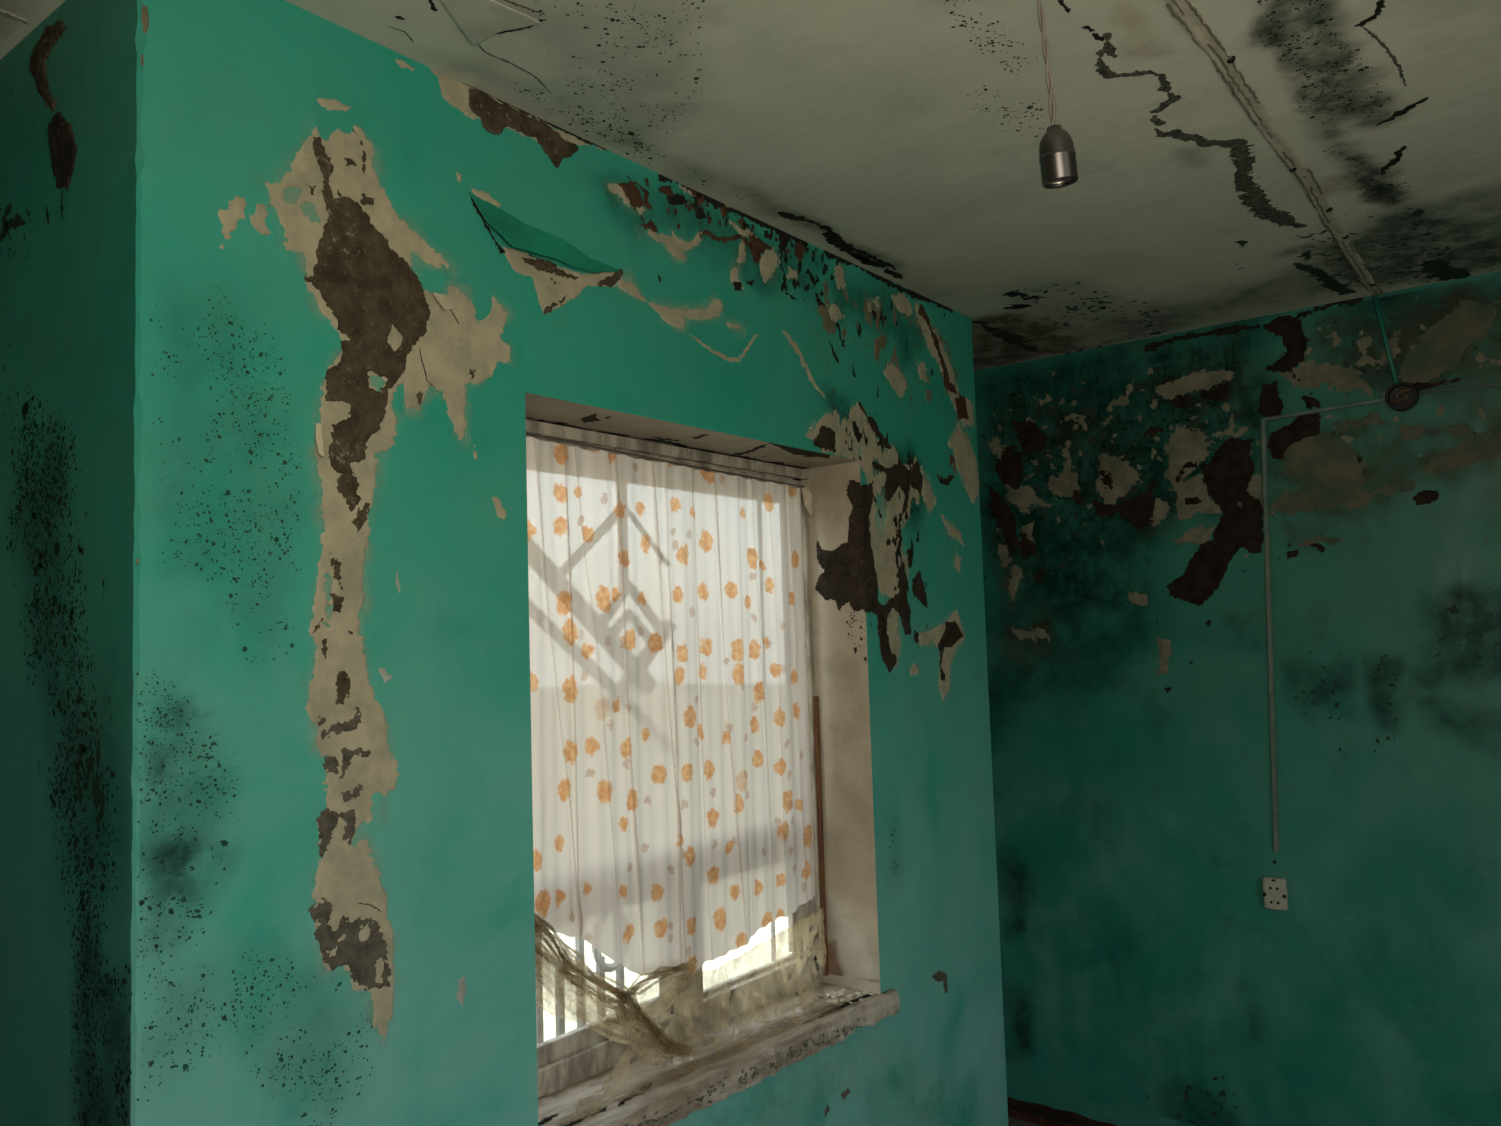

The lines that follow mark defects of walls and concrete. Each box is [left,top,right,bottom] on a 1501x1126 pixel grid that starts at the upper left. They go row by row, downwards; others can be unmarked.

leakage [0,189,30,267]
spalling [29,19,77,225]
leakage [149,286,305,668]
peeling [218,98,511,1043]
crack [389,0,437,43]
peeling [395,59,604,168]
peeling [608,175,1439,701]
crack [1057,0,1384,296]
leakage [1255,0,1501,401]
crack [1354,0,1407,86]
peeling [1381,295,1501,392]
leakage [2,384,373,1126]